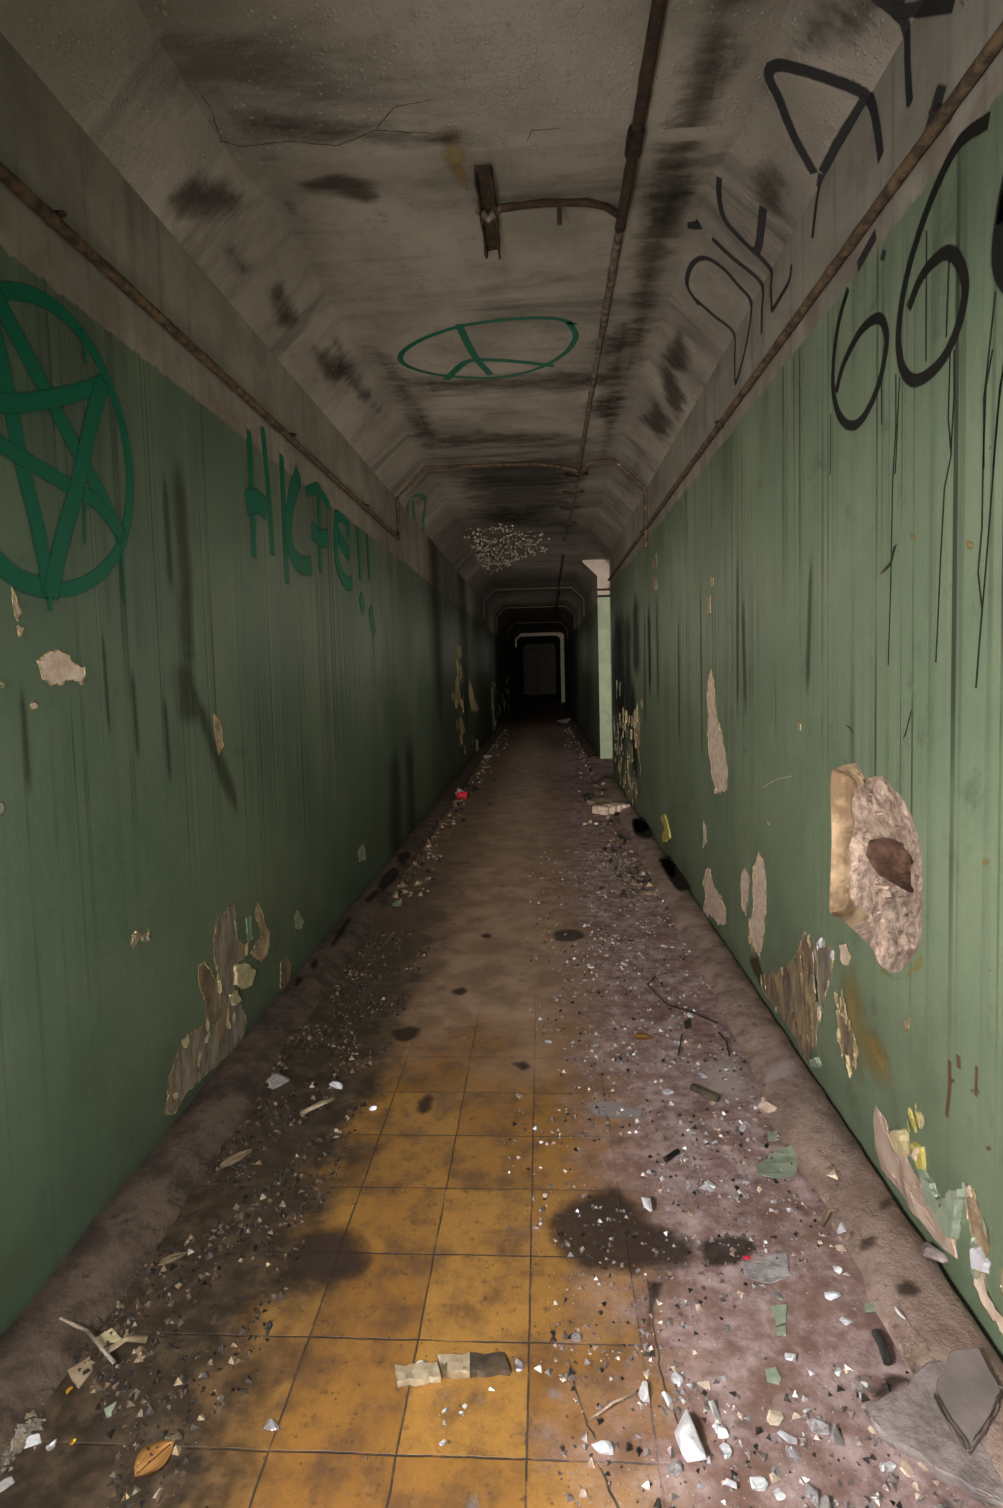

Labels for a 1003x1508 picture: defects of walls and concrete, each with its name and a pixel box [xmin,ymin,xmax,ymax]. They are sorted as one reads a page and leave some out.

spalling [36,649,86,686]
peeling [613,681,643,805]
peeling [706,668,728,794]
peeling [162,902,291,1118]
spalling [703,763,923,1078]
flaking render [873,1103,1003,1336]